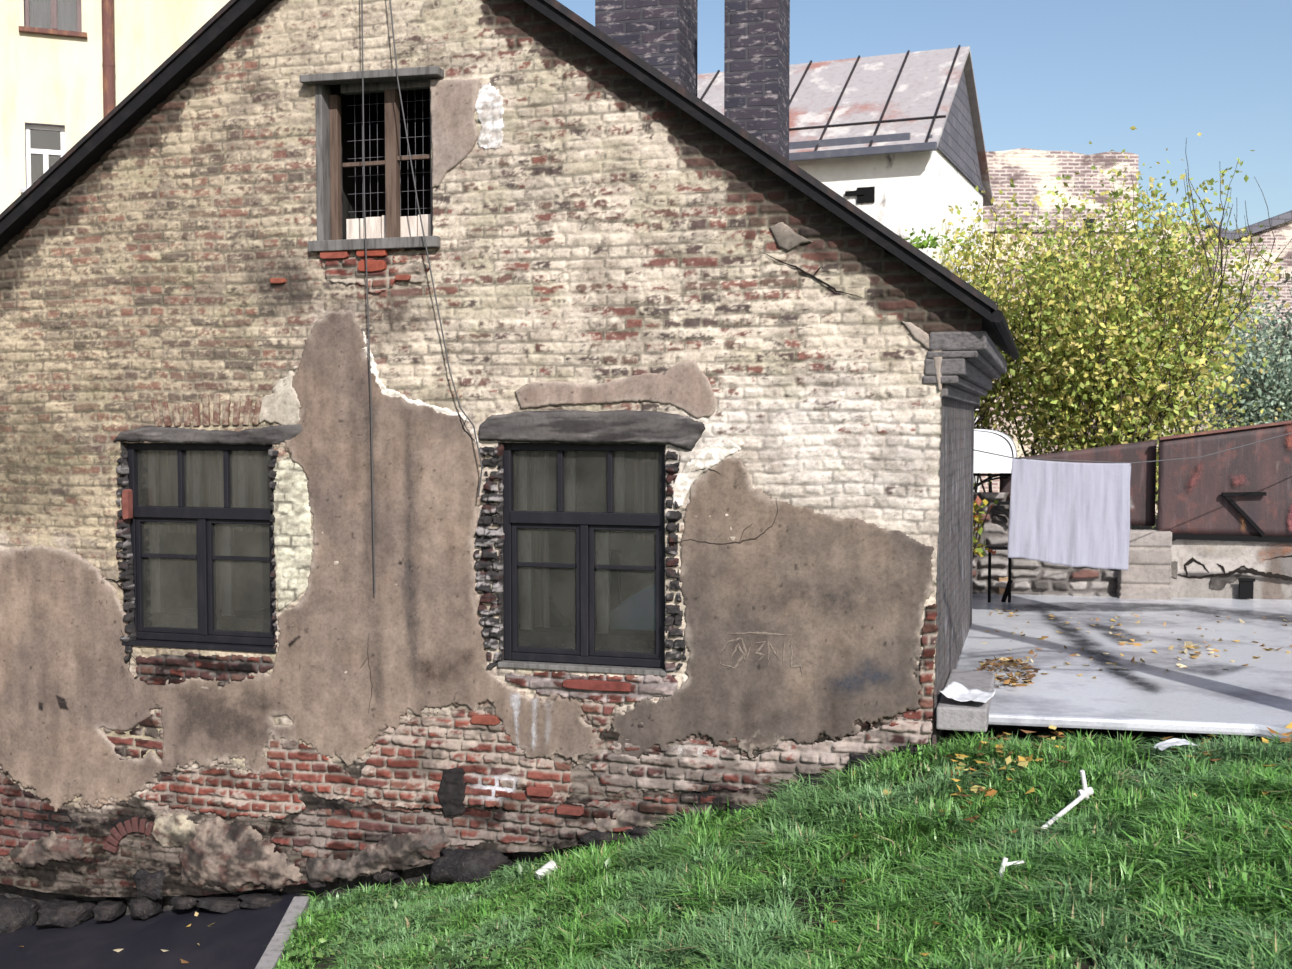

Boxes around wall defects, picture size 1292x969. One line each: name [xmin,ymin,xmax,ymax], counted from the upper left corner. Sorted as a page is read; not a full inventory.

peeling [430,79,505,188]
crack [763,253,862,298]
peeling [0,308,943,860]
crack [1172,539,1292,581]
damp [512,693,537,745]